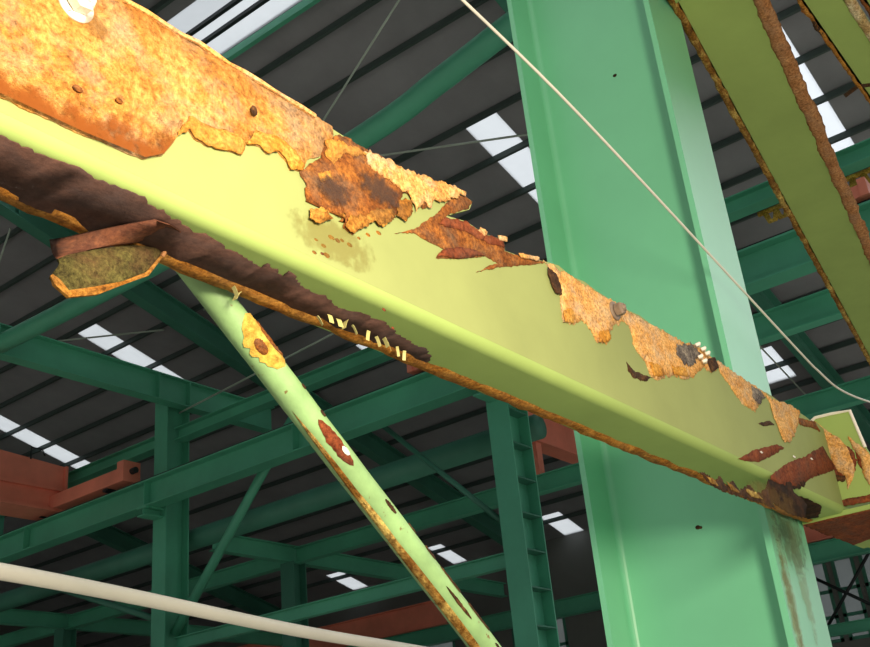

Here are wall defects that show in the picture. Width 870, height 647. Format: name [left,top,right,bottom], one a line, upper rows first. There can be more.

peeling [0,135,432,363]
corrosion [292,411,480,647]
corrosion [0,0,820,443]
corrosion [0,187,870,545]
corrosion [667,0,870,365]